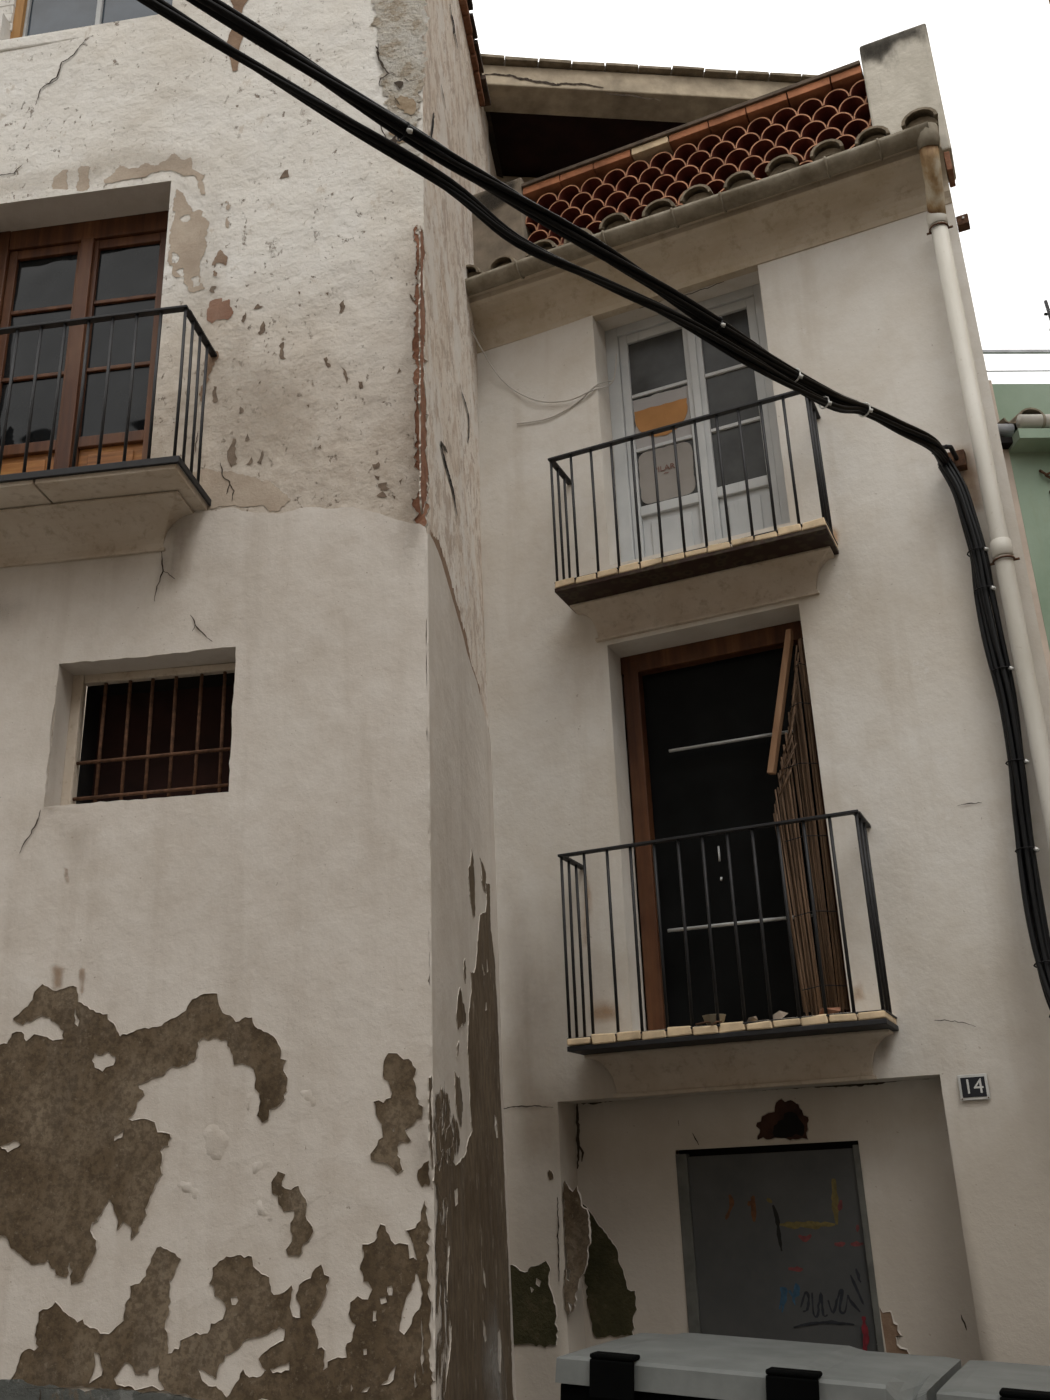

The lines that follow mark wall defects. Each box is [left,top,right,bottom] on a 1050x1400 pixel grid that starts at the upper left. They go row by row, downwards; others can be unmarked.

crack [35,39,86,105]
spalling [370,0,430,127]
spalling [384,131,420,155]
flaking render [52,153,265,335]
crack [440,394,470,513]
crack [154,552,175,601]
peeling [0,849,514,1400]
spalling [756,1098,809,1142]
peeling [548,1170,591,1317]